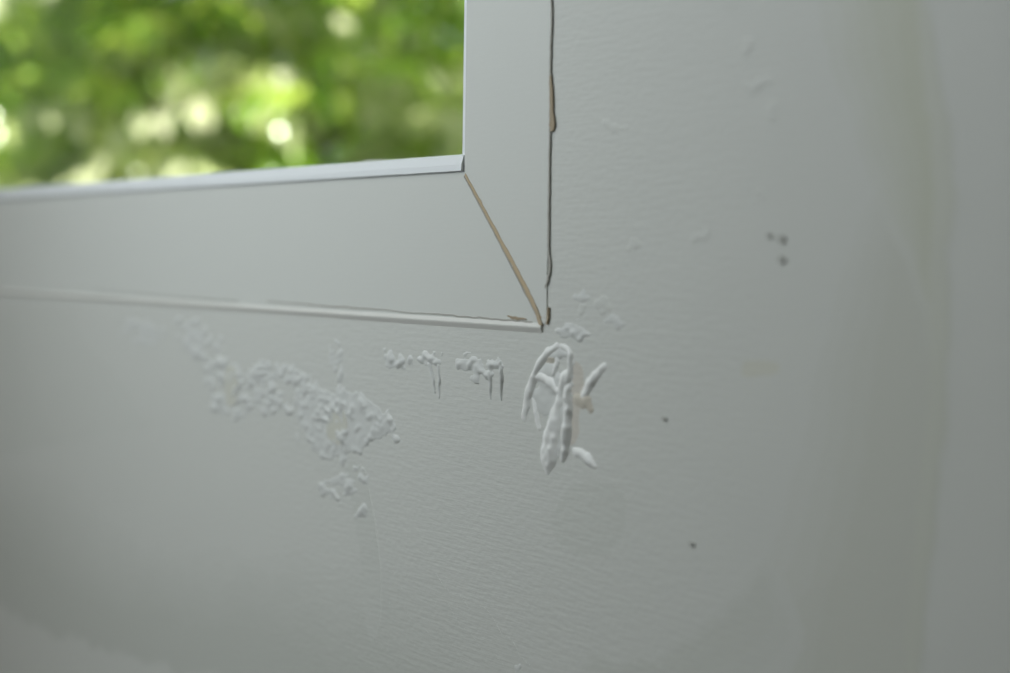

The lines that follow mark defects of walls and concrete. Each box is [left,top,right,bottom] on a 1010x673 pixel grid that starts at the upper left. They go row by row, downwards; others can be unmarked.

peeling [383,348,442,399]
peeling [455,352,504,401]
peeling [521,342,607,475]
leakage [579,0,934,673]
leakage [0,307,537,673]